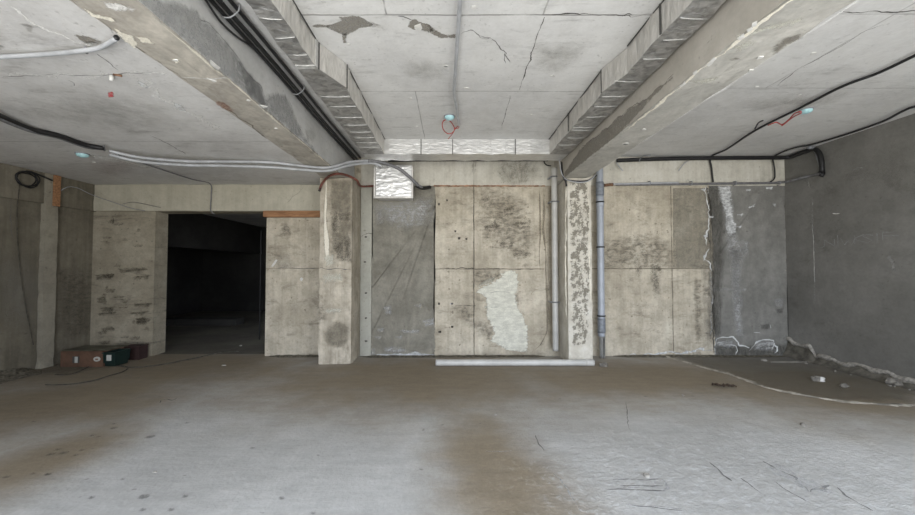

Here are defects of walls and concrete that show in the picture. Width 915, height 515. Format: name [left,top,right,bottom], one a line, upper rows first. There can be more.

peeling [85,3,154,52]
spalling [399,16,455,38]
crack [461,13,594,124]
peeling [155,19,350,281]
peeling [565,182,591,345]
flaking render [782,337,915,391]